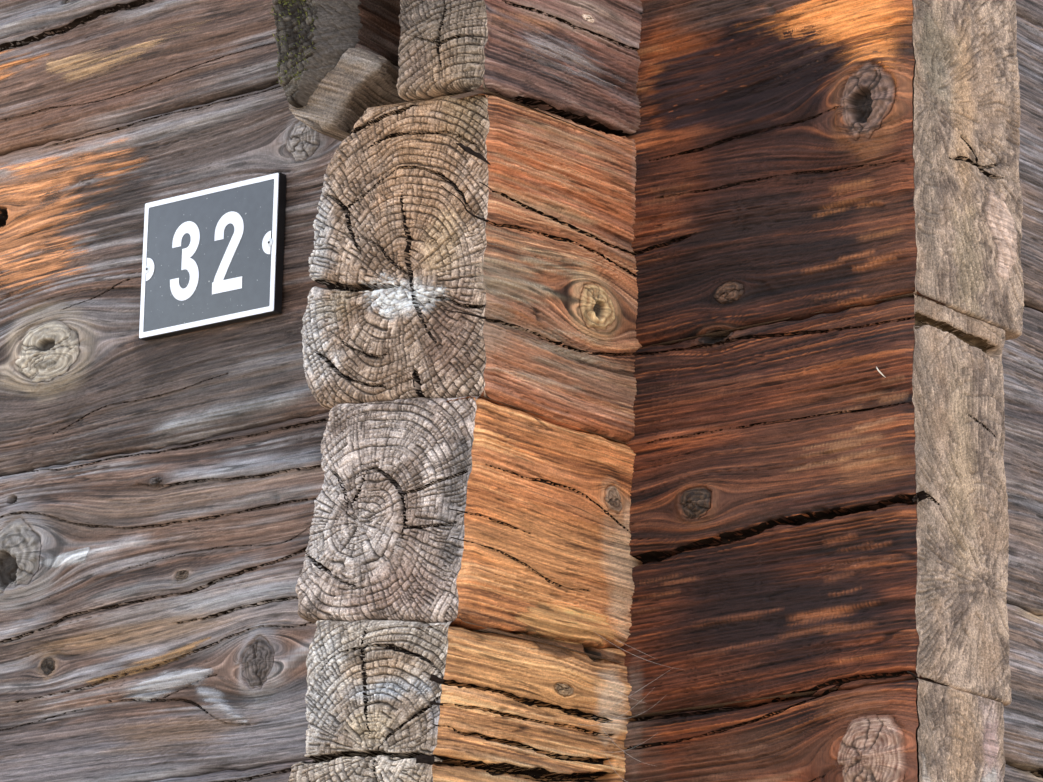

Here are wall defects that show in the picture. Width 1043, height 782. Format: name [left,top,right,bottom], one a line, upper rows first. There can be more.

crack [0,0,153,52]
crack [948,137,1004,179]
crack [314,105,995,357]
crack [23,419,327,472]
crack [1,498,316,529]
crack [0,527,371,643]
crack [143,464,629,591]
crack [632,491,940,565]
crack [1,596,312,731]
crack [217,626,934,782]